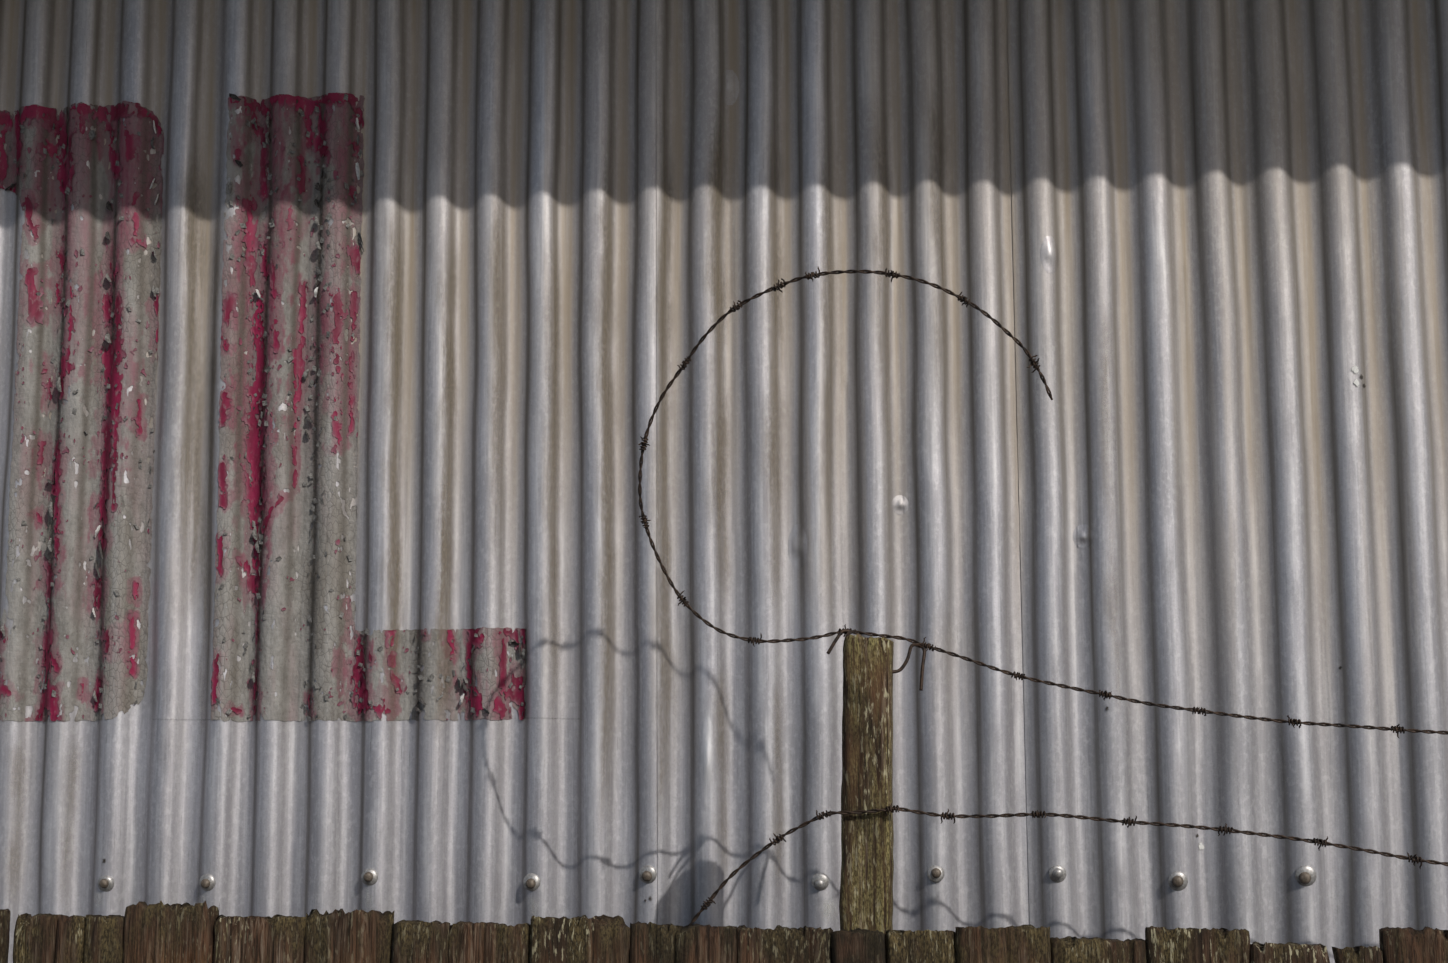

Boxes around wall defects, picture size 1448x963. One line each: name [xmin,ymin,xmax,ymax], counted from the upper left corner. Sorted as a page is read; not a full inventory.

peeling [0,102,162,721]
peeling [211,93,526,721]